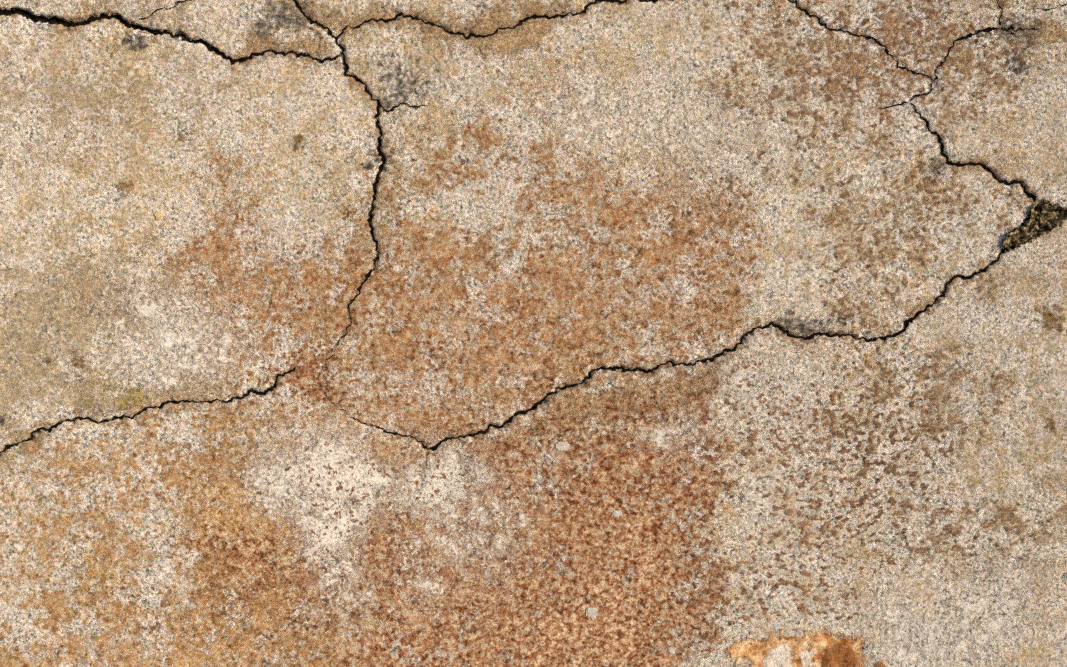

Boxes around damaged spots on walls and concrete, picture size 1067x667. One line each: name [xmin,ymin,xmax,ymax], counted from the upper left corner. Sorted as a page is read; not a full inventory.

corrosion [417,124,516,190]
corrosion [0,141,1058,667]
crack [0,0,1067,463]
corrosion [700,0,1036,179]